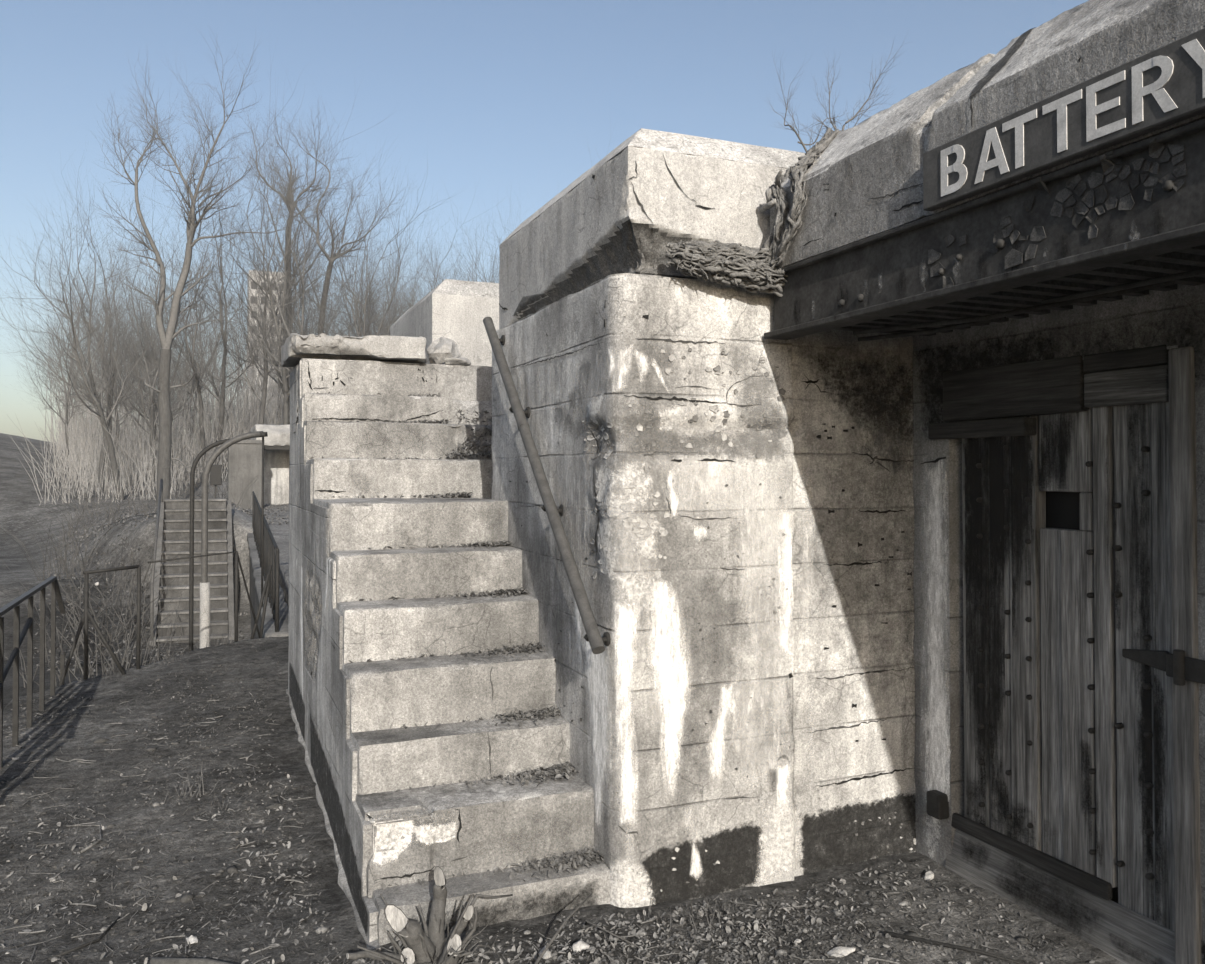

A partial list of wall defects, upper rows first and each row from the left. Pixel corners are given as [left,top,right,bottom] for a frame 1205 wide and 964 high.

crack [970,28,1034,127]
spalling [513,219,698,320]
damp [289,560,368,935]
spalling [366,811,456,865]
crack [589,429,604,563]
damp [575,573,688,822]
damp [642,460,951,905]
damp [963,414,1072,847]
damp [1004,864,1095,936]
damp [1081,743,1102,864]
damp [1108,405,1154,650]
damp [1137,665,1165,923]